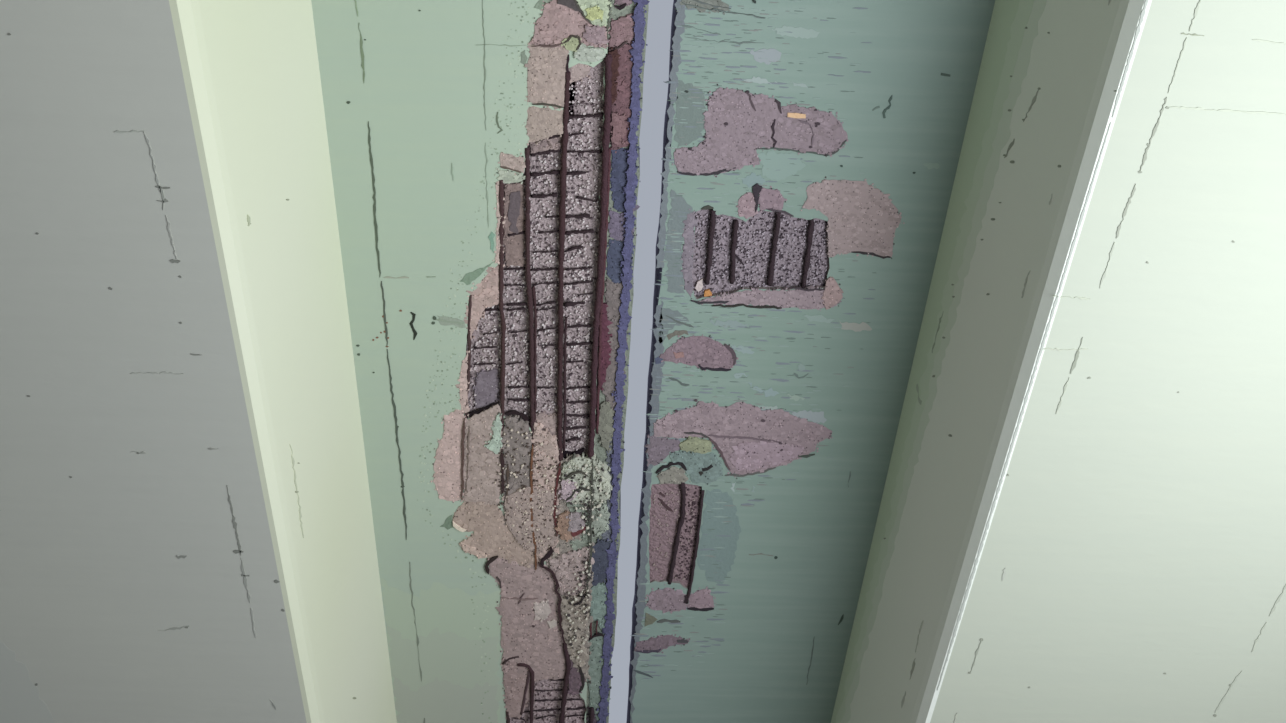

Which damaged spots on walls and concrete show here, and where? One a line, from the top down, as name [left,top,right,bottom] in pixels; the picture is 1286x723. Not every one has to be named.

crack [114,130,180,263]
spalling [672,84,905,311]
spalling [431,0,635,723]
rust [598,302,613,391]
spalling [659,334,738,371]
spalling [644,399,833,614]